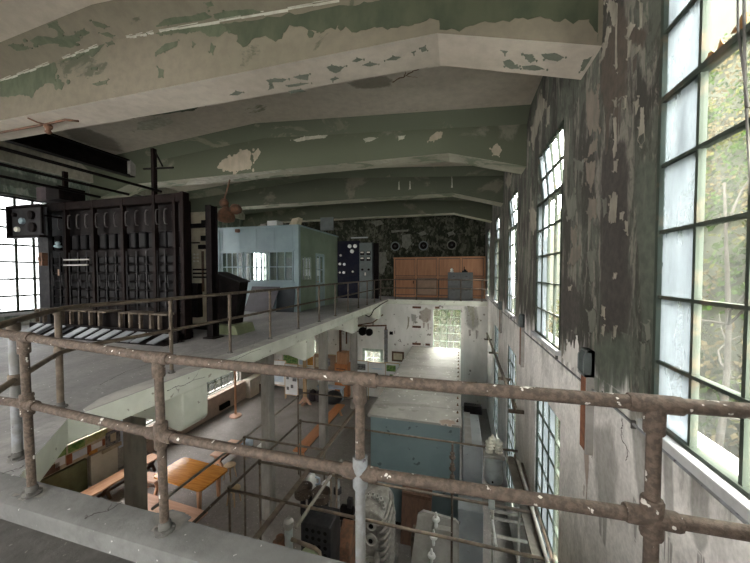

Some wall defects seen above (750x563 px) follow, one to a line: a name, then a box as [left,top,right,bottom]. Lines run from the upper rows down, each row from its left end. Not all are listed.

peeling [0,20,115,98]
peeling [183,148,292,186]
peeling [266,73,312,94]
peeling [327,55,401,82]
water stain [346,74,395,90]
peeling [146,0,643,74]
peeling [529,89,550,150]
peeling [573,83,628,236]
water stain [592,0,658,394]
peeling [611,95,645,173]
water stain [561,276,582,349]
peeling [586,305,618,339]